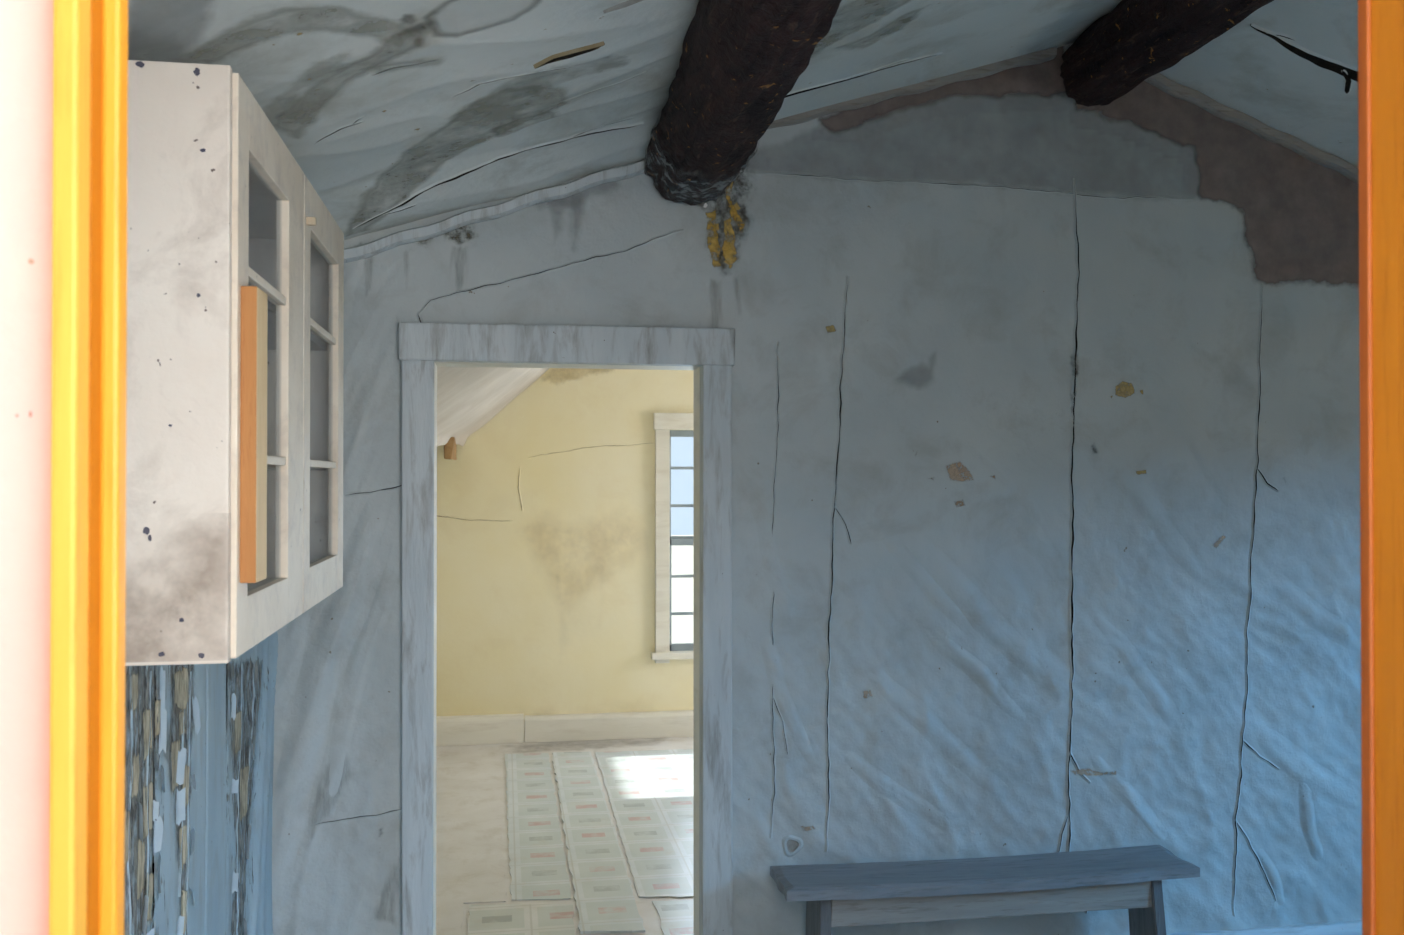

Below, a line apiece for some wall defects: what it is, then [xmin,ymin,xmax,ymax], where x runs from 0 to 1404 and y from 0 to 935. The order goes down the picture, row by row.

peeling [820,46,1359,285]
crack [768,589,776,646]
crack [771,342,781,538]
crack [824,276,853,852]
crack [1056,178,1091,853]
crack [1231,283,1280,916]
crack [769,684,789,838]